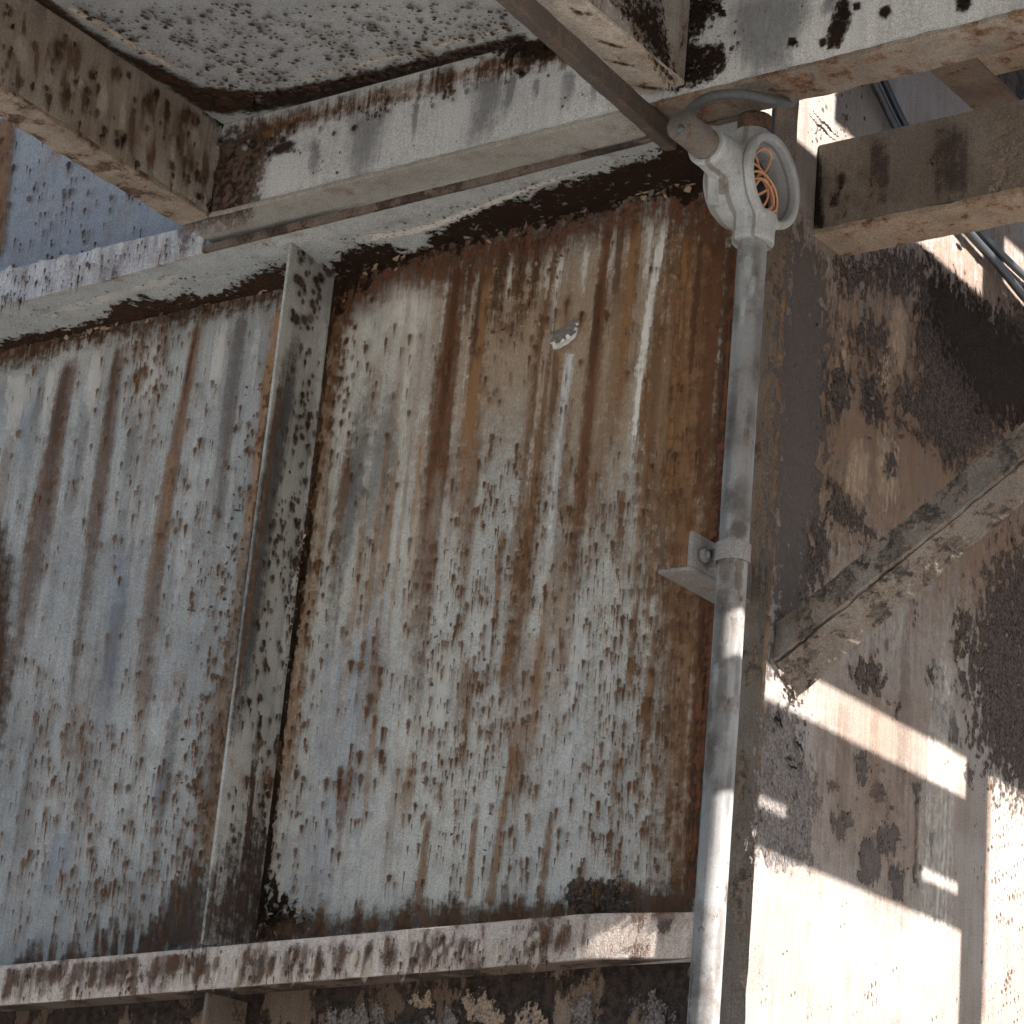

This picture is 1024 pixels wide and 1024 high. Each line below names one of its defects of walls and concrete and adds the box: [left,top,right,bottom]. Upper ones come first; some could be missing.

corrosion [35,0,566,236]
damp [738,0,802,69]
peeling [551,318,581,349]
corrosion [0,143,737,985]